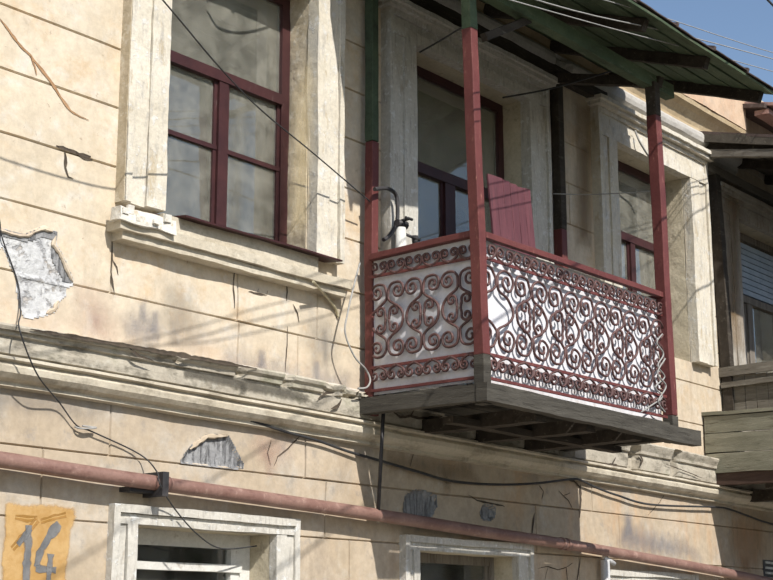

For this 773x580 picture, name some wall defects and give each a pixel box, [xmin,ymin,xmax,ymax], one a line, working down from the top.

crack [0,19,88,120]
crack [56,145,92,179]
peeling [0,225,74,319]
crack [110,242,118,289]
water stain [185,369,308,398]
spalling [180,433,244,470]
spalling [403,489,438,517]
crack [538,557,581,580]